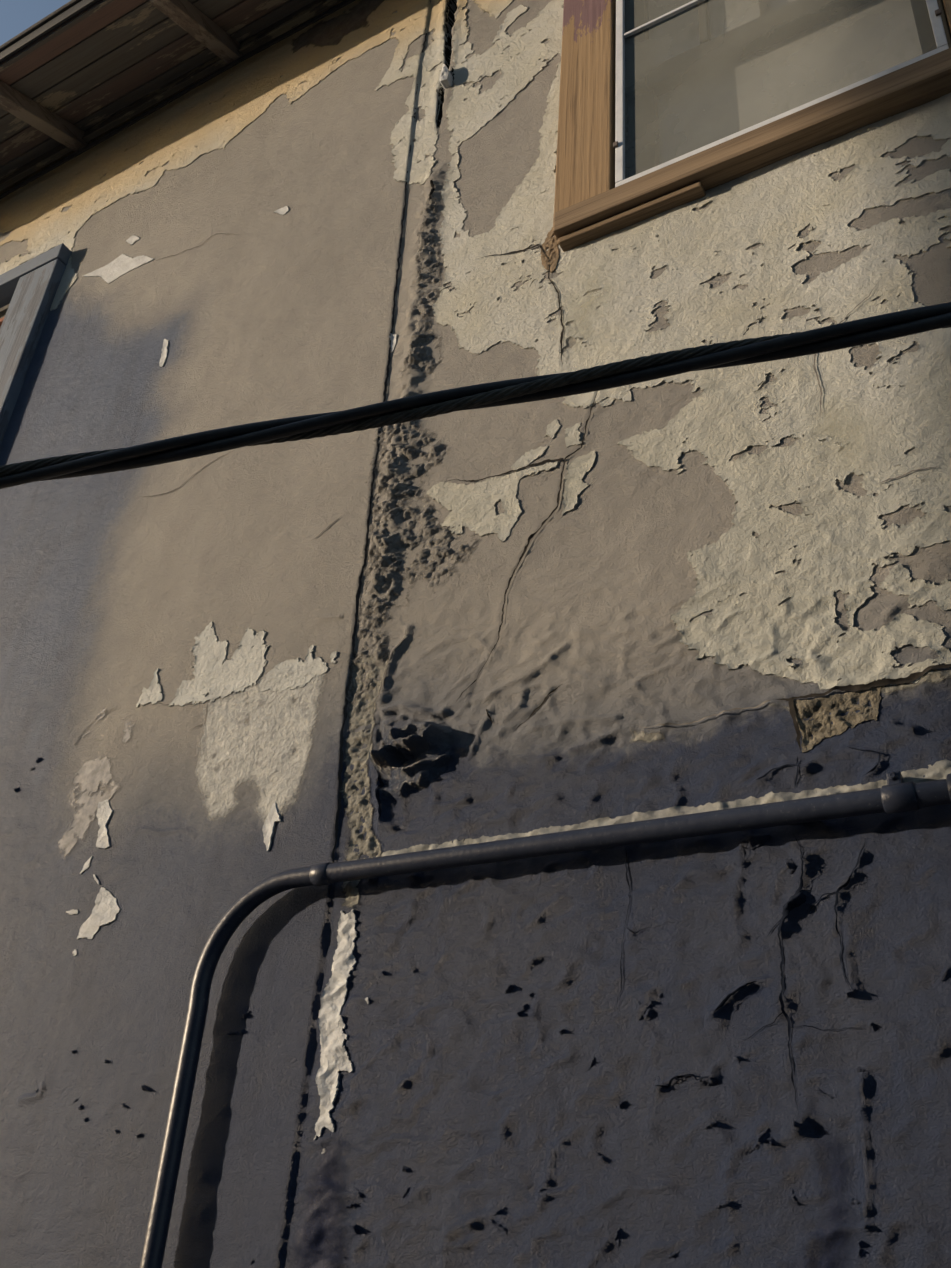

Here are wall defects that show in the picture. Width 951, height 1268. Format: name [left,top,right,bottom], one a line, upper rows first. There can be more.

peeling [0,0,951,376]
crack [478,244,564,361]
crack [316,0,457,906]
crack [439,391,598,699]
peeling [136,327,951,861]
peeling [58,757,121,956]
spalling [314,879,361,1154]
crack [616,847,650,1017]
crack [655,1074,708,1088]
crack [714,836,866,1115]